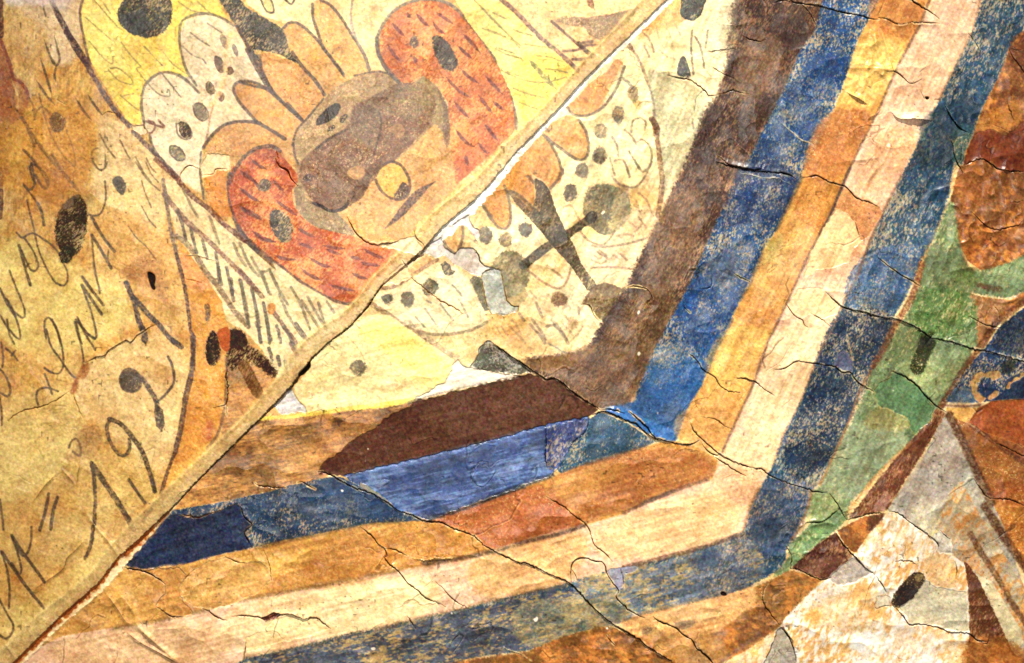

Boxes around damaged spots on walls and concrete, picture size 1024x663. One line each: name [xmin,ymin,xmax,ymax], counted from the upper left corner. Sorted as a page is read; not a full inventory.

crack [773,0,940,27]
crack [667,35,766,98]
crack [783,123,817,149]
crack [888,65,1024,174]
crack [715,155,879,236]
crack [971,199,1024,251]
crack [683,273,752,314]
crack [878,257,921,288]
crack [688,293,1024,413]
peeling [319,340,598,549]
crack [224,341,990,663]
crack [123,565,333,662]